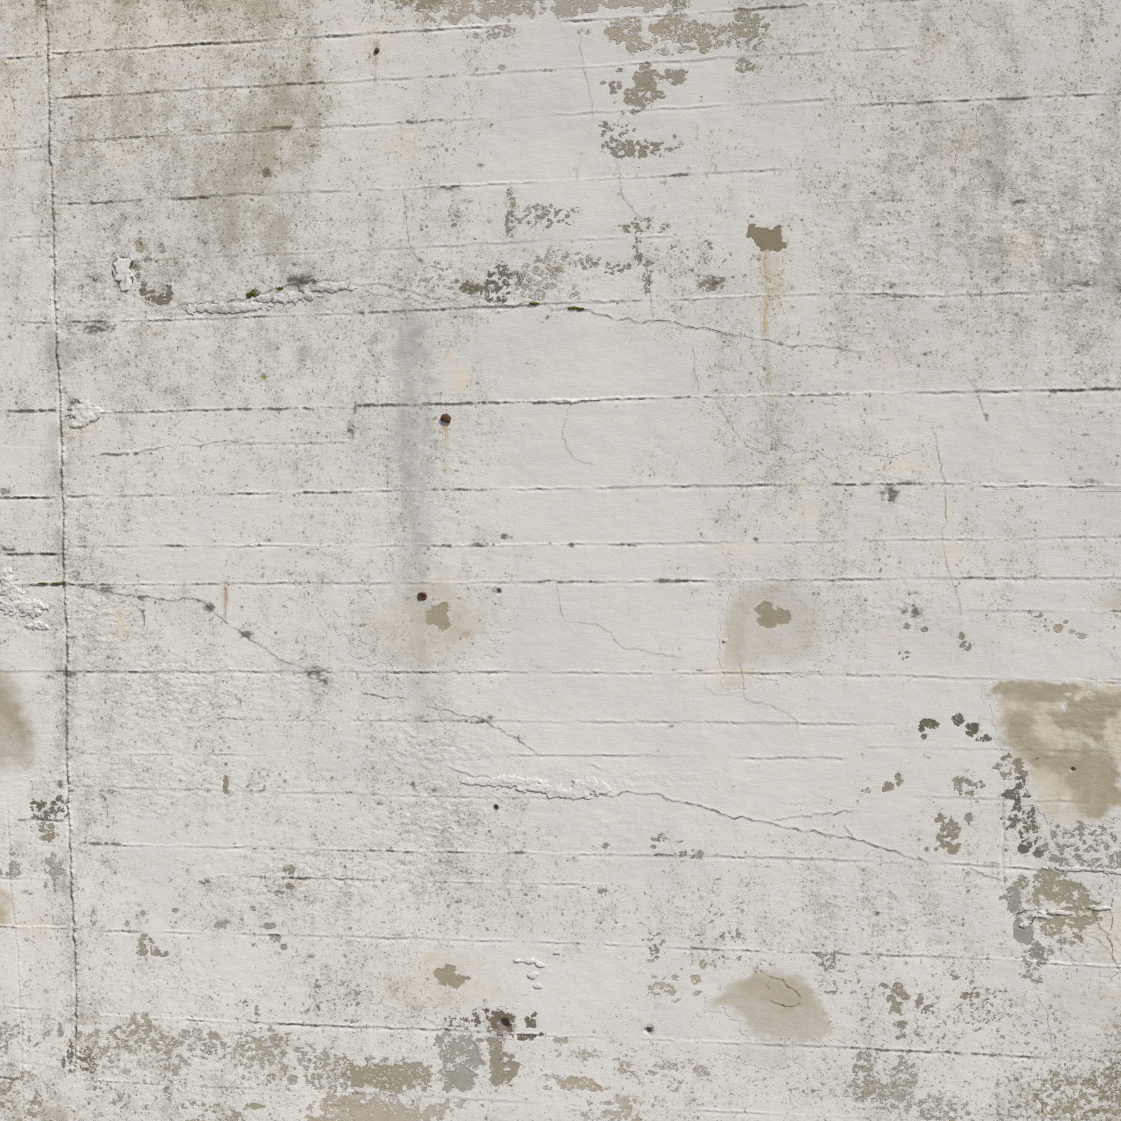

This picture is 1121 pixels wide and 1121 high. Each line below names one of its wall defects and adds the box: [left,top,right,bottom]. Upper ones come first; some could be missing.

peeling [370,0,770,159]
peeling [389,217,669,303]
peeling [505,189,580,236]
peeling [671,240,735,292]
crack [560,169,858,381]
leakage [717,579,838,684]
peeling [0,847,21,877]
peeling [30,795,68,891]
crack [590,764,923,860]
peeling [993,753,1121,984]
peeling [307,980,369,1024]
peeling [613,1058,709,1108]